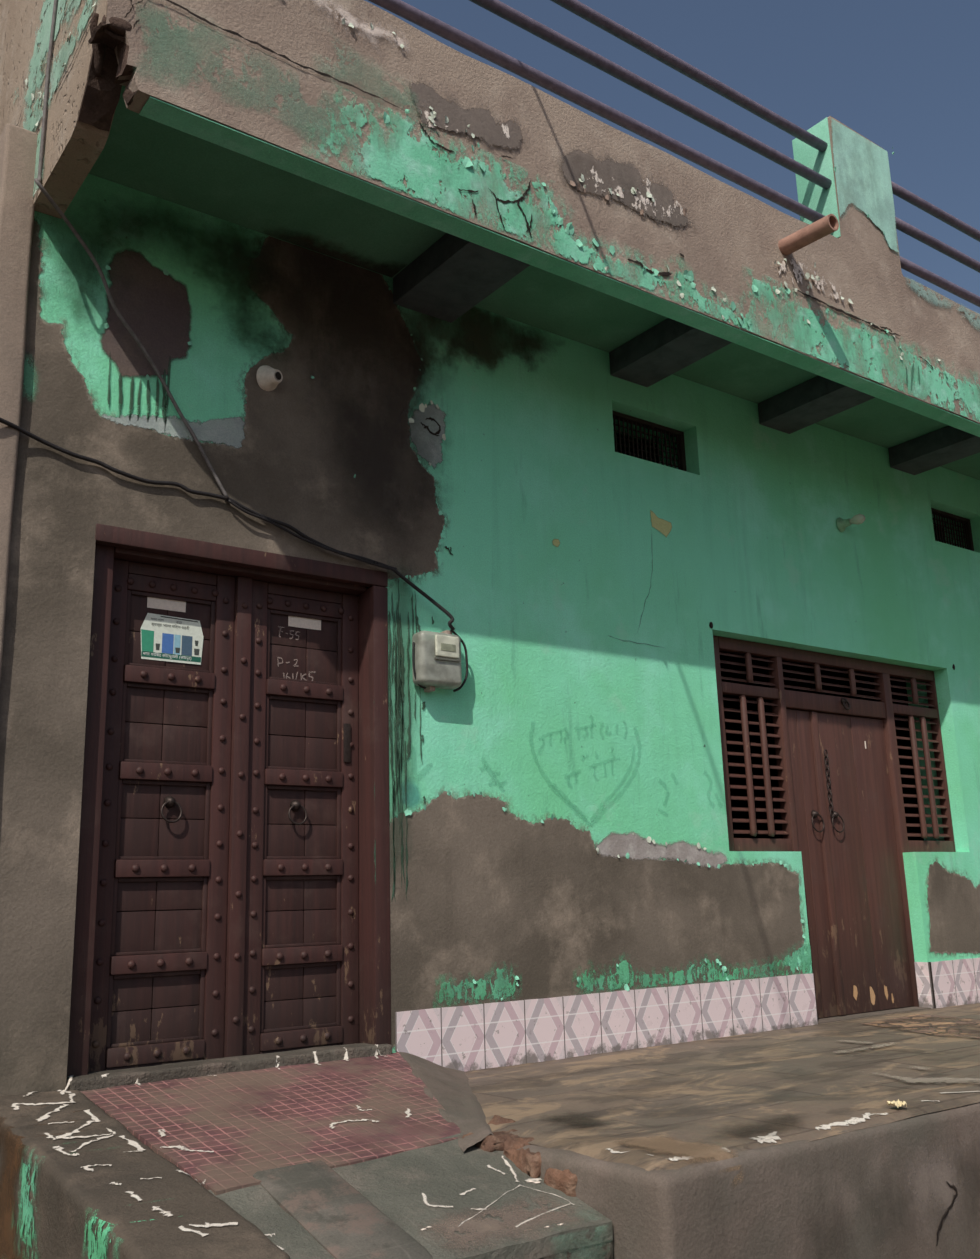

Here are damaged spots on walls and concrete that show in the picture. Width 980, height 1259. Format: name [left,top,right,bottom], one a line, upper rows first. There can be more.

spalling [15,0,138,197]
crack [124,0,454,152]
crack [458,181,532,238]
peeling [318,82,980,422]
flaking render [0,219,447,1096]
damp [388,580,434,899]
flaking render [389,791,807,1048]
flaking render [927,859,980,1008]
crack [936,1181,958,1246]